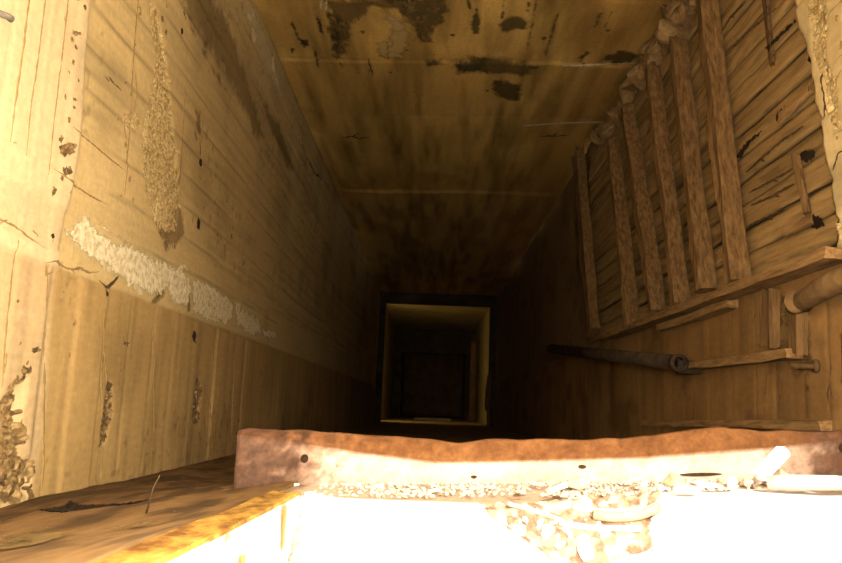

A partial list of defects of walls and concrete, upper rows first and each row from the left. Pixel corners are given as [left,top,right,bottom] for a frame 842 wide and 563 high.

damp [290,22,319,67]
damp [317,0,449,65]
damp [467,0,480,34]
damp [452,56,539,101]
damp [500,2,537,34]
damp [561,51,639,67]
damp [161,207,184,250]
crack [0,218,119,492]
spalling [99,380,113,448]